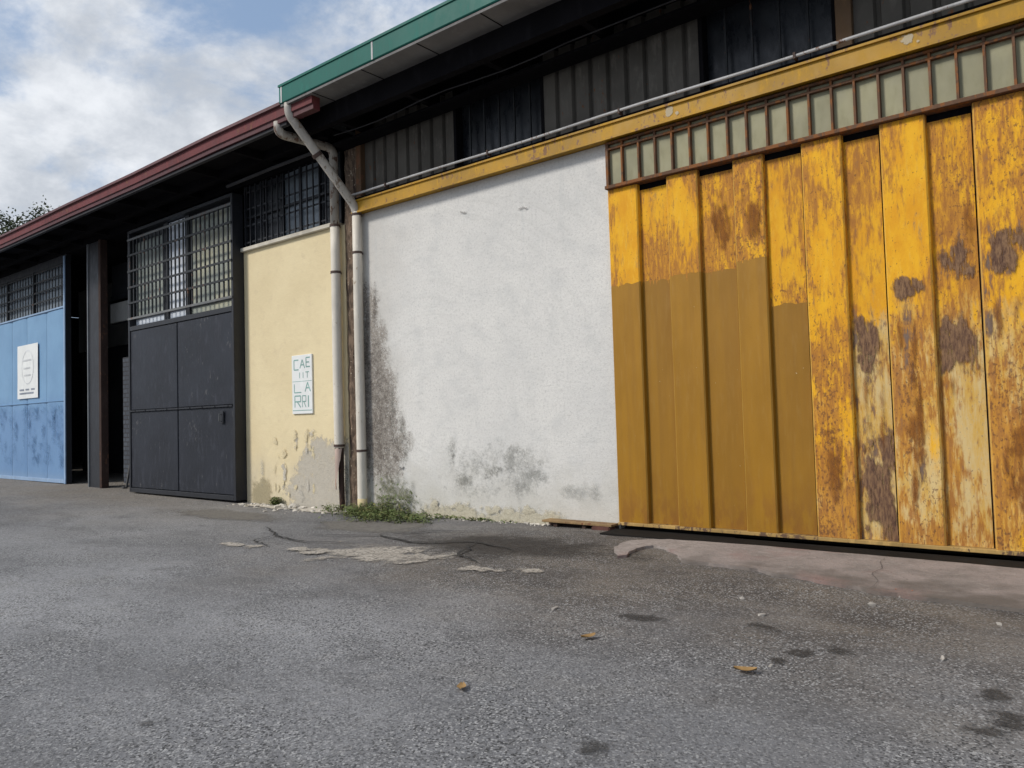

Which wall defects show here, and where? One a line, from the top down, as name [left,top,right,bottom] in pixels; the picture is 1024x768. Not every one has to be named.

corrosion [712,204,728,247]
corrosion [741,197,759,234]
corrosion [937,237,975,280]
corrosion [988,226,1024,274]
damp [363,287,407,482]
corrosion [853,315,879,401]
corrosion [939,315,979,387]
peeling [273,429,350,510]
corrosion [860,402,899,542]
corrosion [1004,406,1024,512]